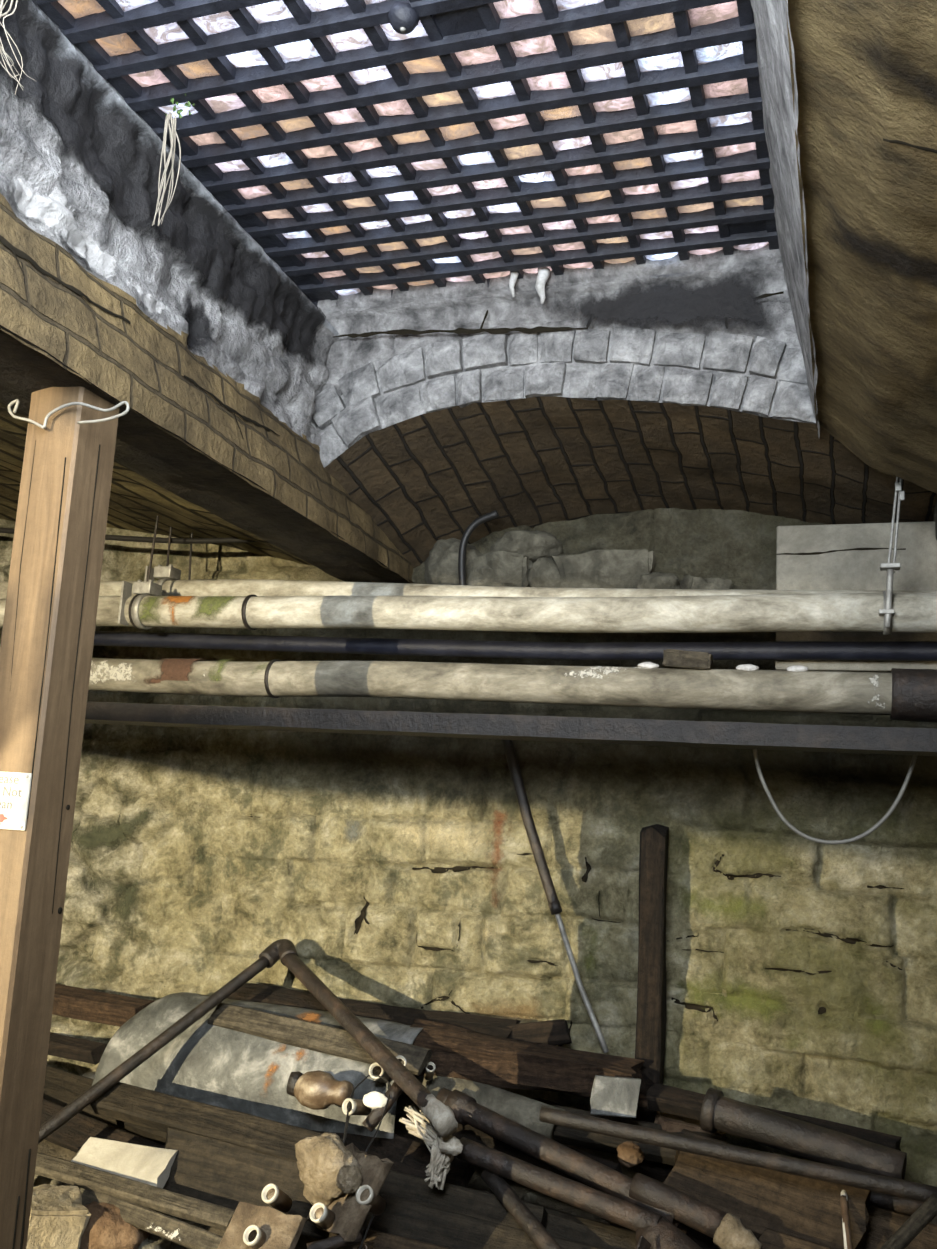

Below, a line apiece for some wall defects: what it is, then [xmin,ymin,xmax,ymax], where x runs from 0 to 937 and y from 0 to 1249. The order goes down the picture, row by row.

crack [883,138,937,154]
crack [333,310,591,338]
crack [776,547,906,555]
crack [412,853,531,873]
crack [713,854,781,880]
crack [354,897,369,934]
crack [786,928,902,970]
crack [765,967,832,975]